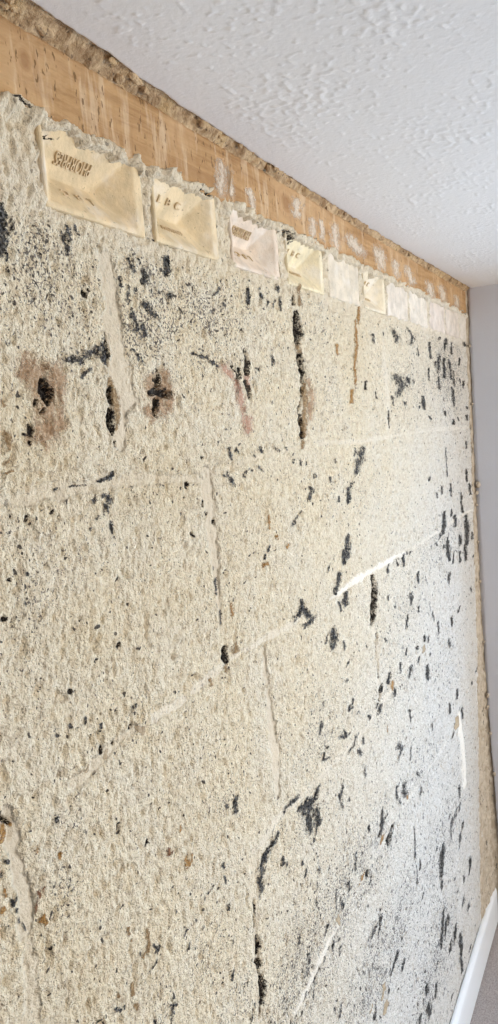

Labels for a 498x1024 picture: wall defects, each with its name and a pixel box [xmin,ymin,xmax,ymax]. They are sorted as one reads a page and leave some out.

flaking render [0,0,470,292]